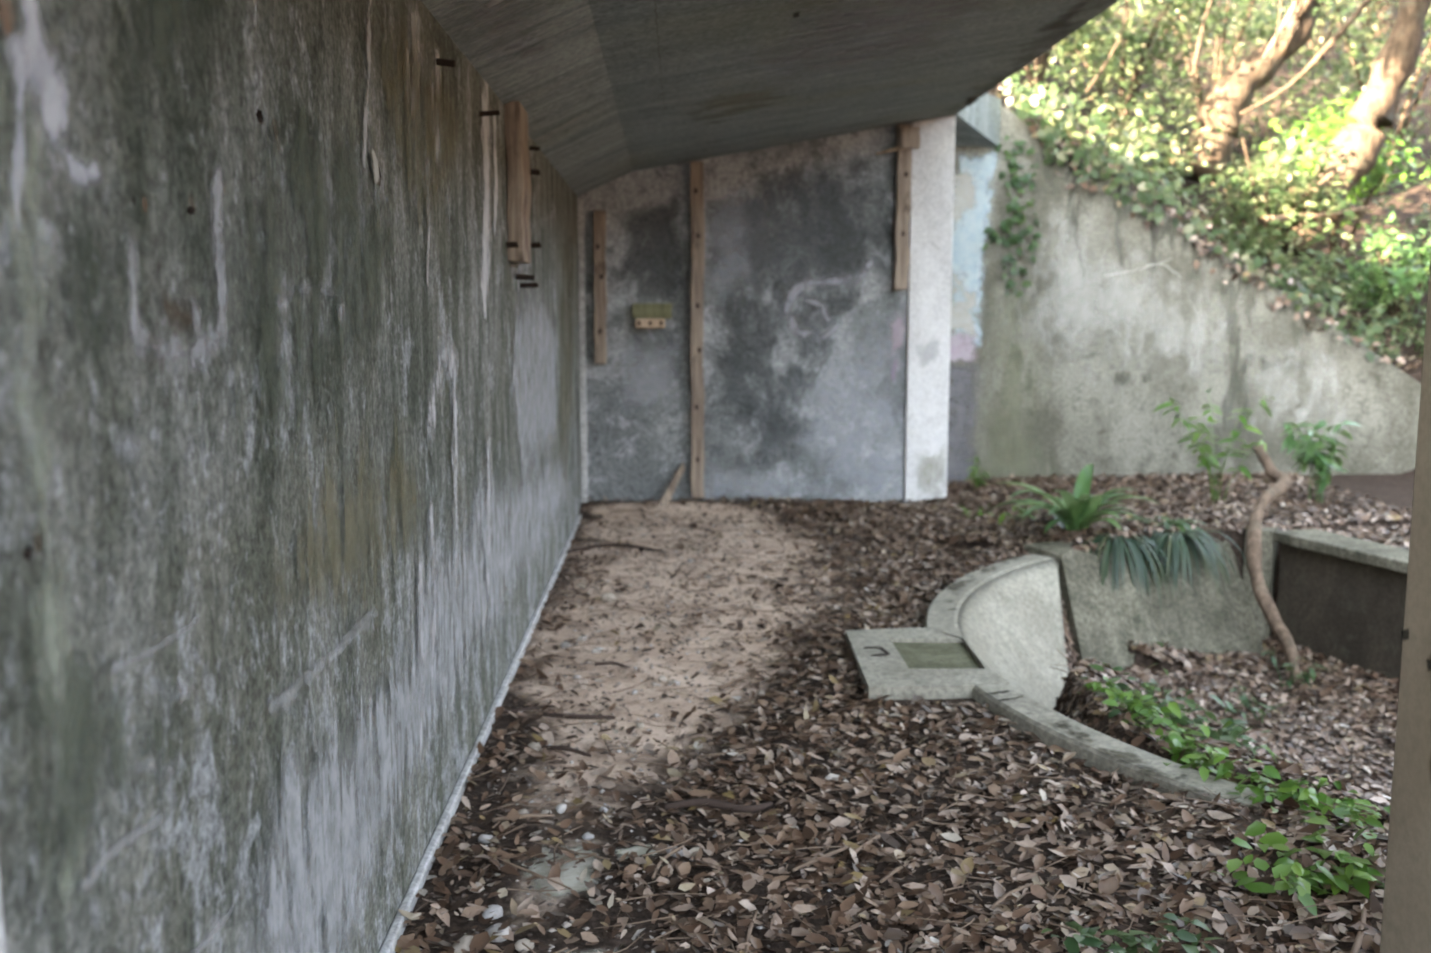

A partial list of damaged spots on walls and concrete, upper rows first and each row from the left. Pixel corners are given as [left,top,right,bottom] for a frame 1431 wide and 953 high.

leakage [363,0,380,184]
leakage [705,159,903,500]